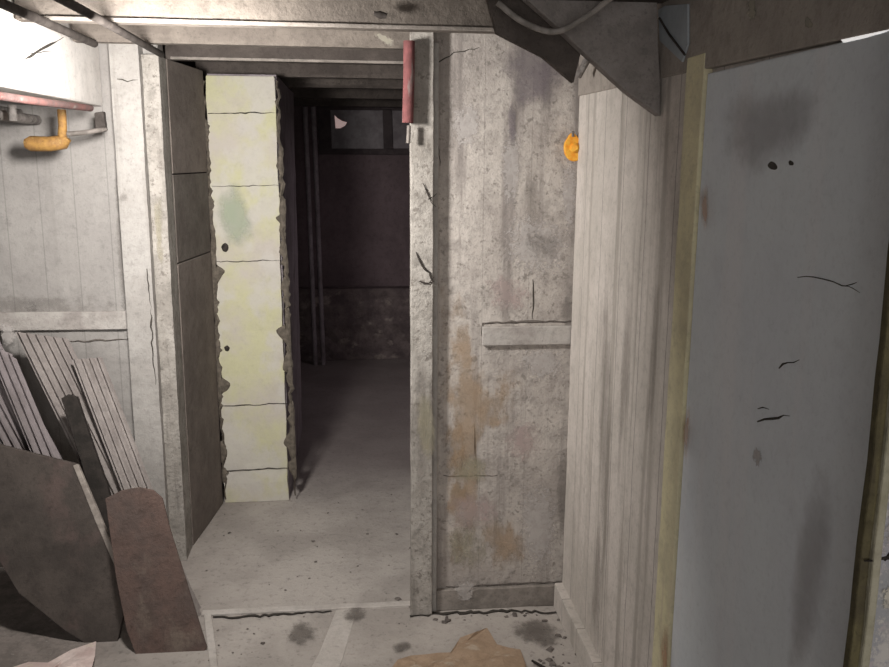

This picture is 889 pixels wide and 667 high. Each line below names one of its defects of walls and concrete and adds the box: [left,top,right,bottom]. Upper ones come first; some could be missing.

spalling [203,80,230,499]
spalling [275,81,297,496]
crack [416,252,434,284]